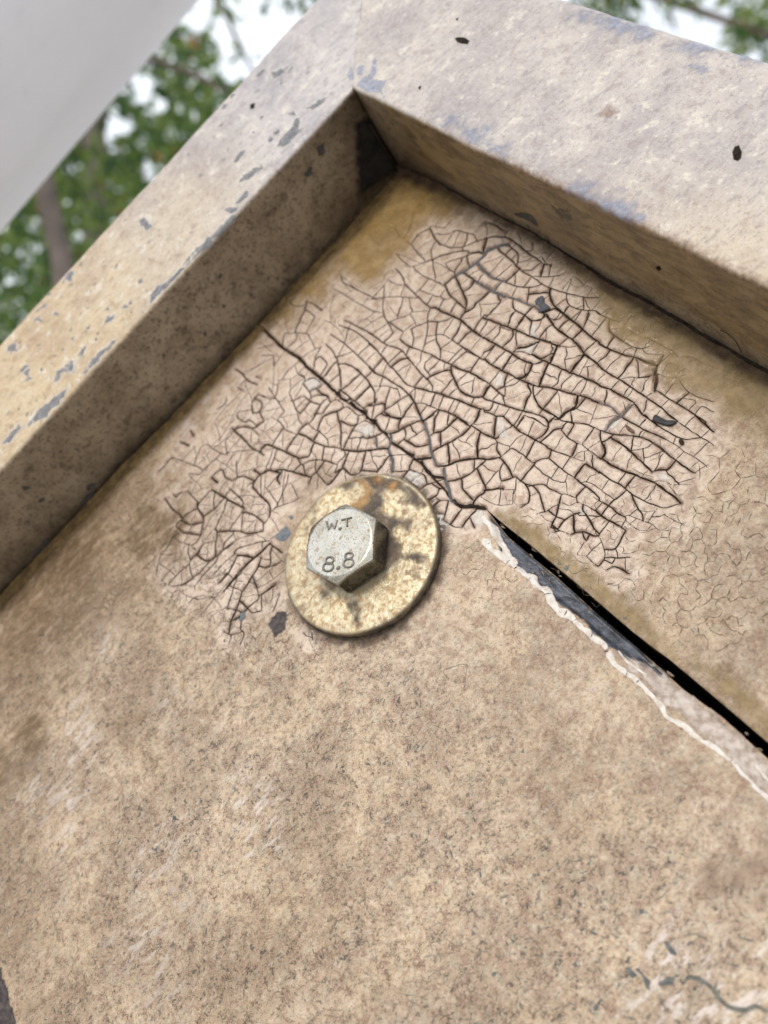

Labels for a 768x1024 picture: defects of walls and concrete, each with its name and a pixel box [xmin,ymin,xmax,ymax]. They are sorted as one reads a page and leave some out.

rust [352,477,397,508]